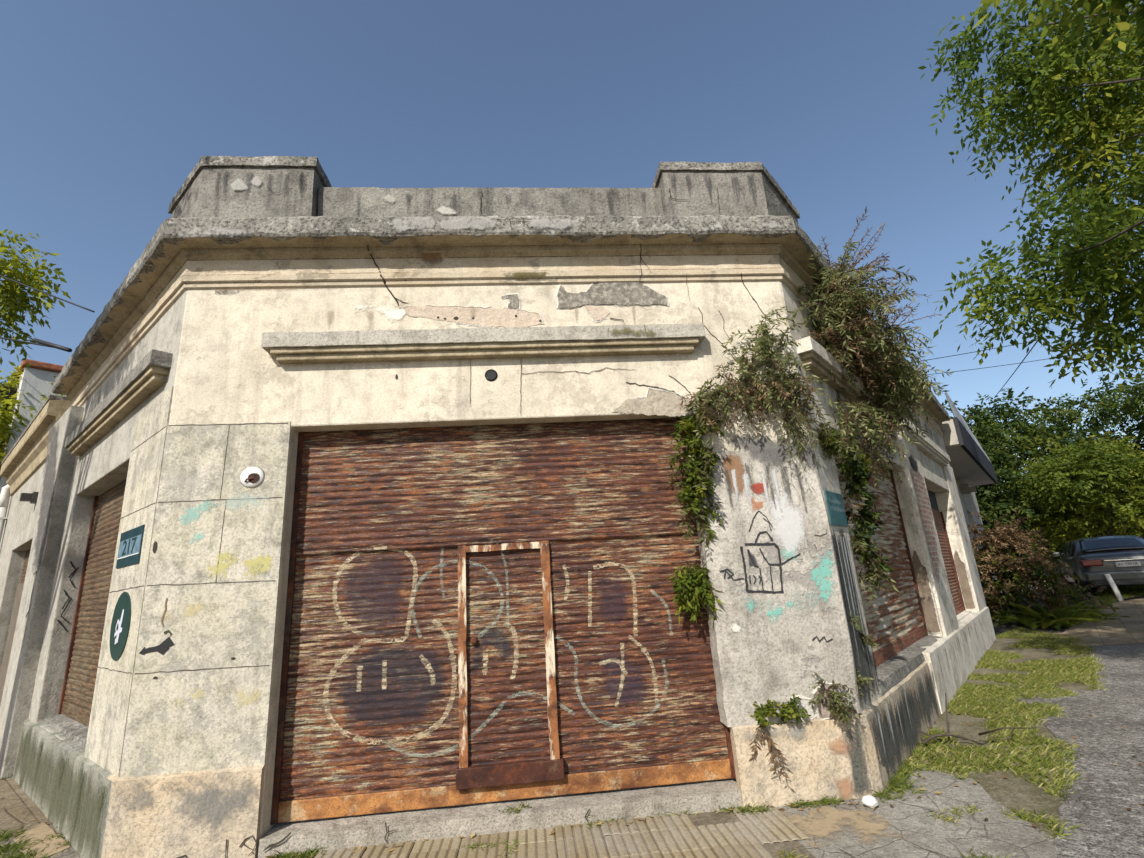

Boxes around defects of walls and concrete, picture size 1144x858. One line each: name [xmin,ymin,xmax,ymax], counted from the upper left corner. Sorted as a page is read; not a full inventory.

crack [367,245,406,306]
peeling [355,293,545,328]
spalling [555,282,670,324]
water stain [832,531,982,794]